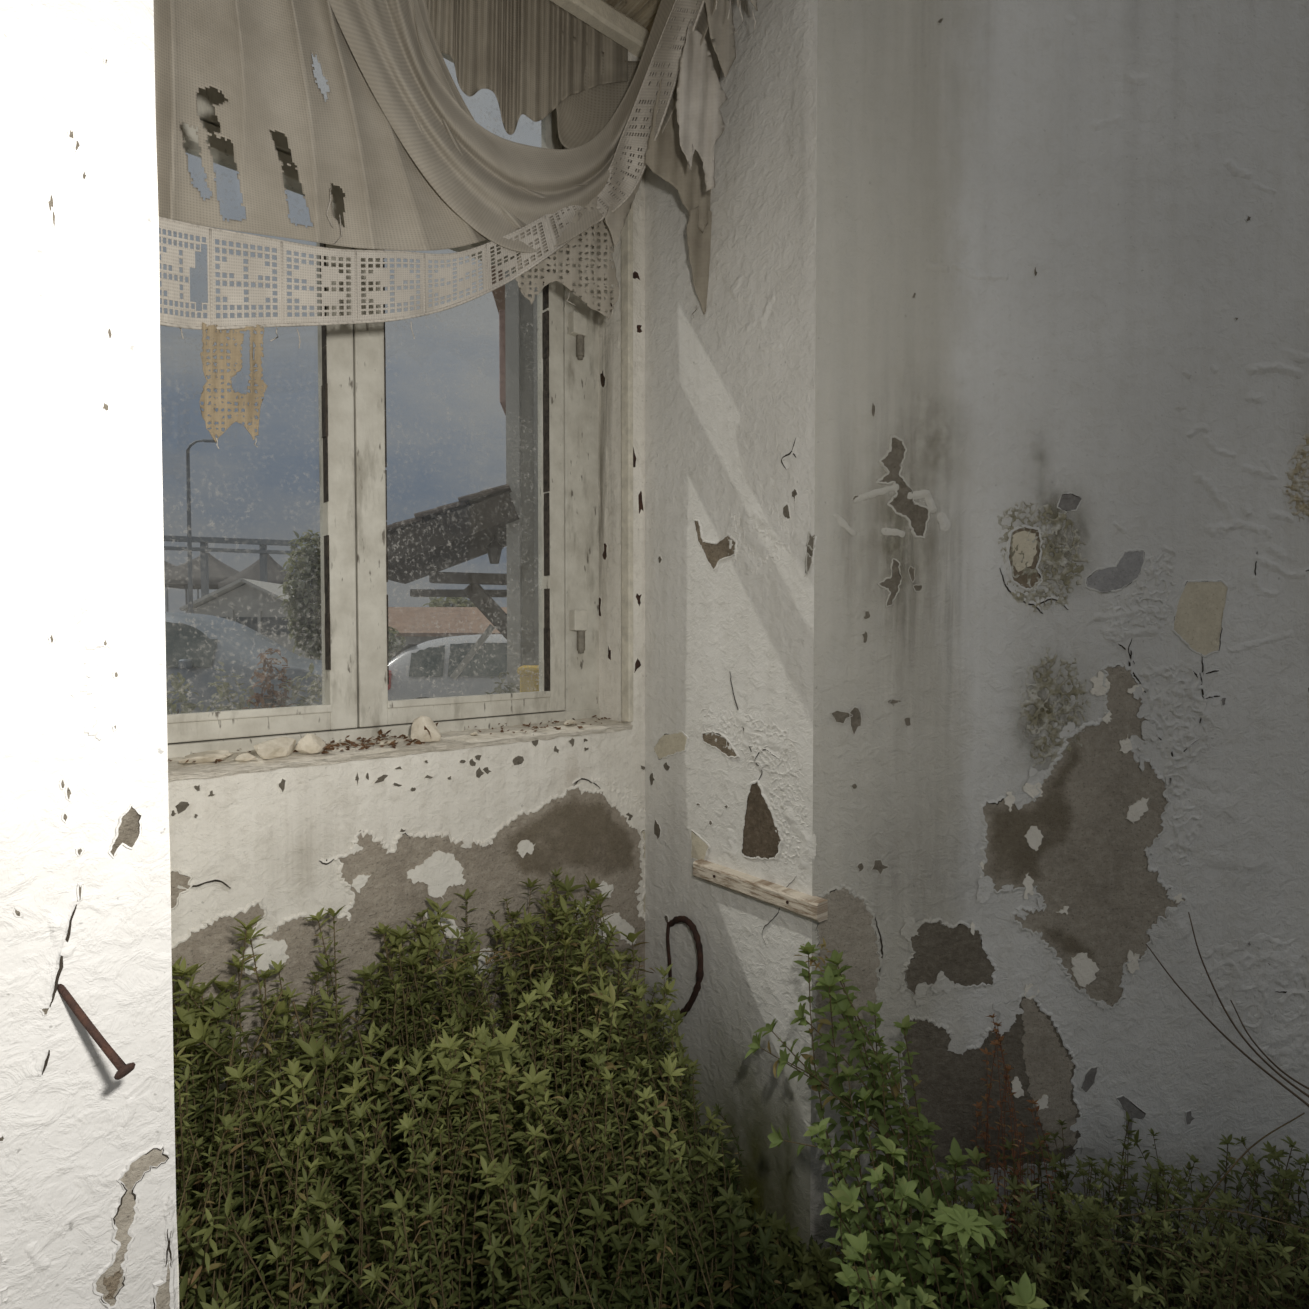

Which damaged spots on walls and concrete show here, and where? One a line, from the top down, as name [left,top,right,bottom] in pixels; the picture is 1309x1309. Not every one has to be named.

peeling [782,488,798,519]
peeling [876,435,930,539]
peeling [1171,579,1229,658]
peeling [354,754,492,792]
peeling [640,730,740,786]
flaking render [740,780,784,861]
peeling [831,706,862,735]
flaking render [976,647,1188,1012]
flaking render [170,784,661,1105]
flaking render [807,884,882,1095]
flaking render [887,916,1098,1176]
peeling [92,1144,171,1309]